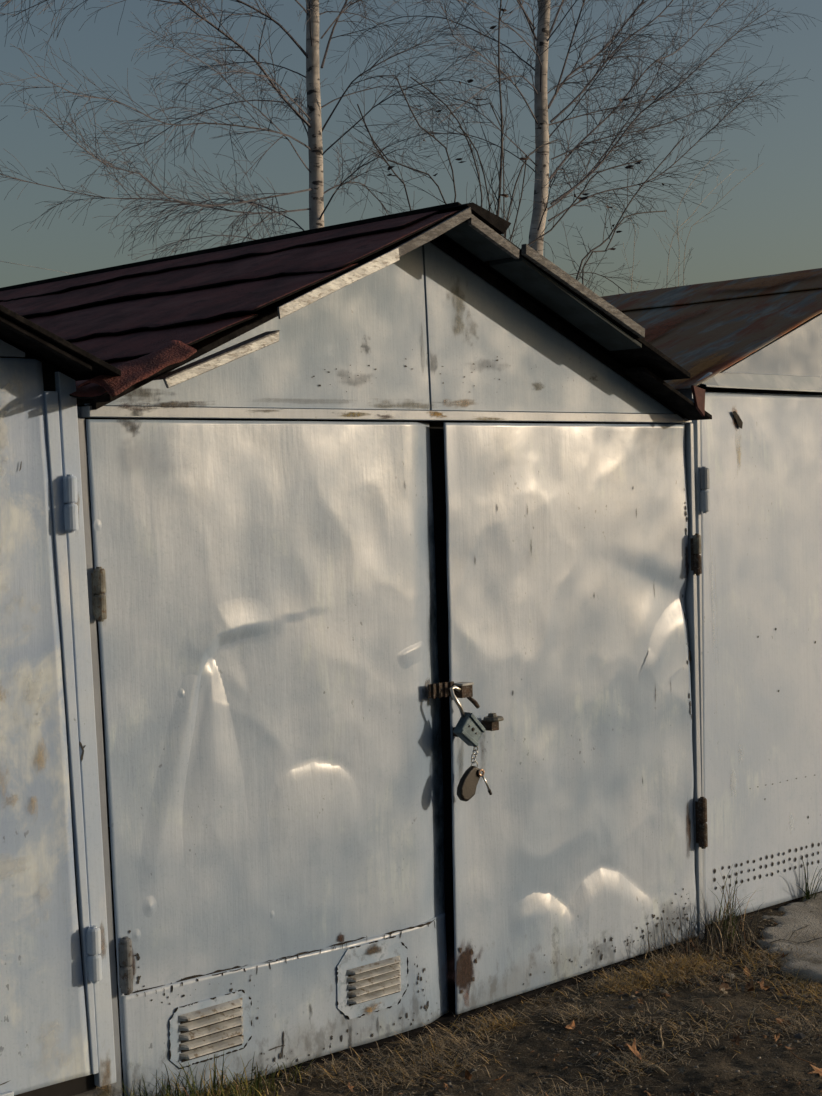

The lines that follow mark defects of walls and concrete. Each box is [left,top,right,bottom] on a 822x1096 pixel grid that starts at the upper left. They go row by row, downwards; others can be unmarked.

corrosion [710,271,820,289]
corrosion [453,947,477,997]